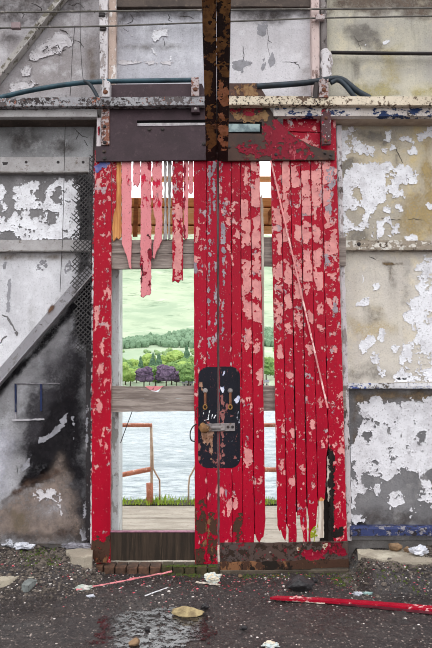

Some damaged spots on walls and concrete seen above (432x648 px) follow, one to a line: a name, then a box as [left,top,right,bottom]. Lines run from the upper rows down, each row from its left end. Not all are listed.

peeling [9,31,73,92]
peeling [0,177,80,240]
peeling [194,161,217,276]
peeling [224,161,262,353]
peeling [272,126,432,336]
peeling [80,166,105,545]
peeling [207,287,223,359]
peeling [359,255,432,382]
peeling [33,488,63,516]
peeling [222,495,238,517]
peeling [243,447,253,468]
peeling [337,396,432,525]